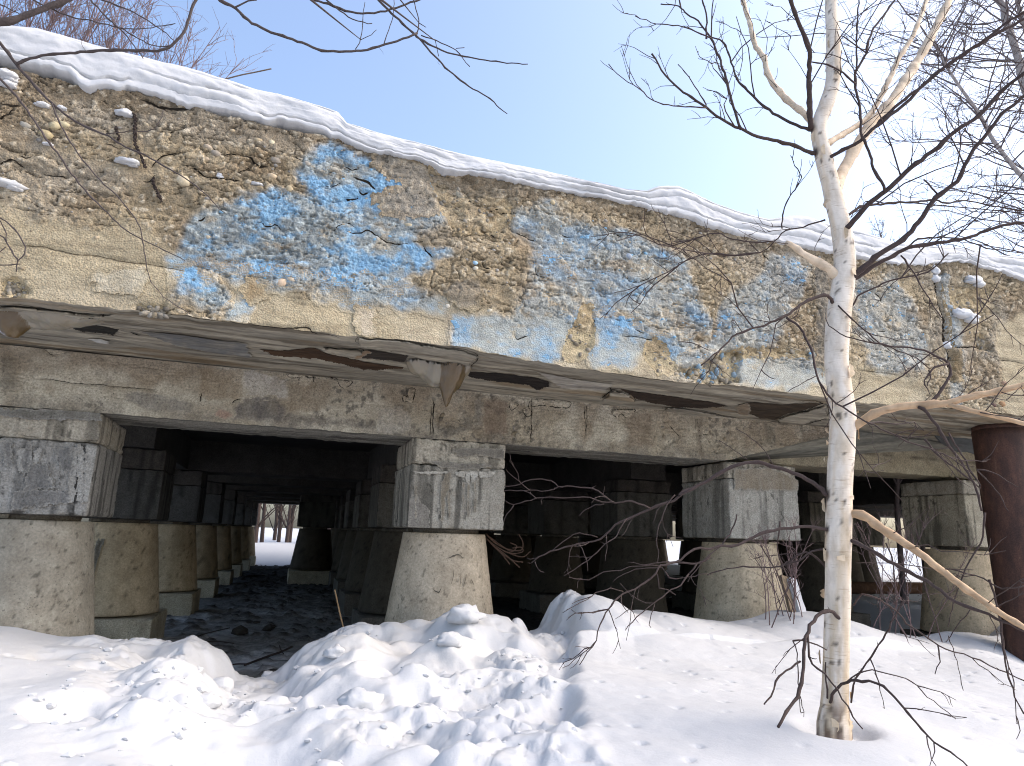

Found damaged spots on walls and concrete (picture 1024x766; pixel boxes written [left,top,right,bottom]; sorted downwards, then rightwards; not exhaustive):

spalling [10,121,79,148]
crack [326,167,432,257]
peeling [136,121,829,456]
water stain [408,394,510,528]